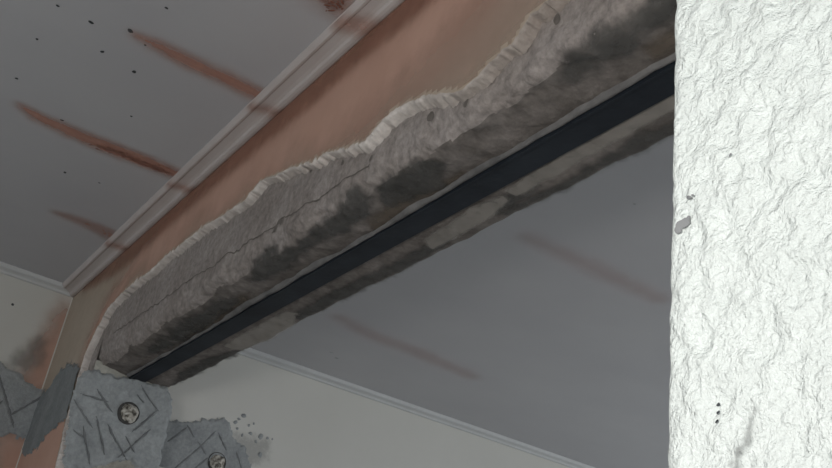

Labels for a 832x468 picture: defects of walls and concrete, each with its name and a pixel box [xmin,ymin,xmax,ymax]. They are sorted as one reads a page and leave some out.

corrosion [24,108,178,176]
crack [114,165,369,333]
corrosion [88,0,425,285]
water stain [87,0,537,348]
flaking render [73,0,677,393]